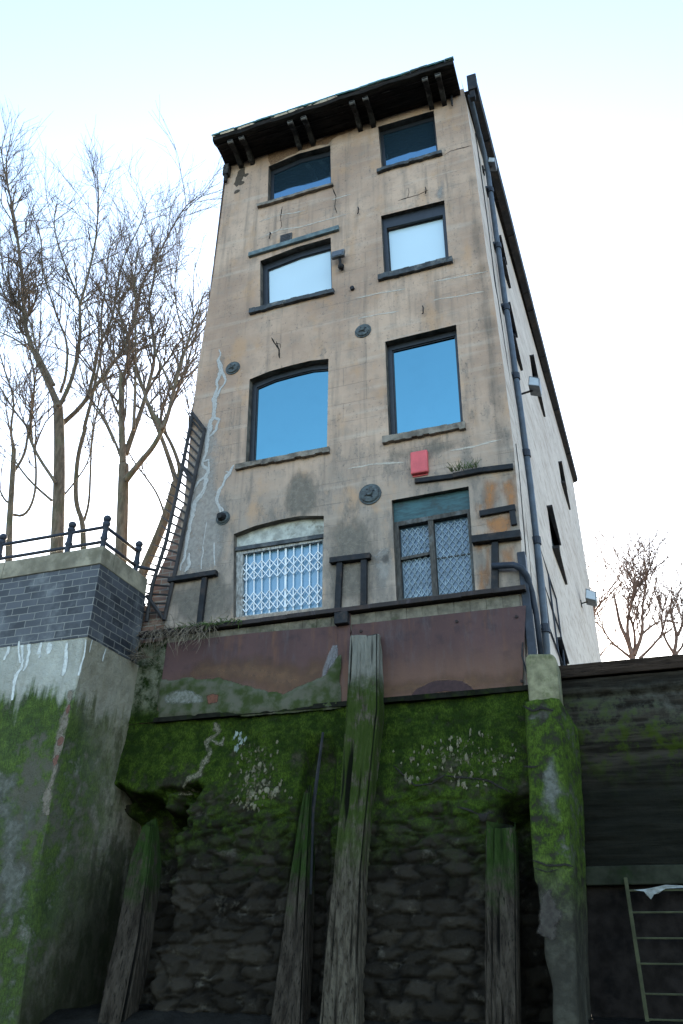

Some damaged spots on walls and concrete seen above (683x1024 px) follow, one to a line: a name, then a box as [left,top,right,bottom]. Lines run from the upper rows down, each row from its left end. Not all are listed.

rust [489,517,510,532]
damp [3,640,93,700]
spalling [157,655,341,717]
crack [178,722,225,795]